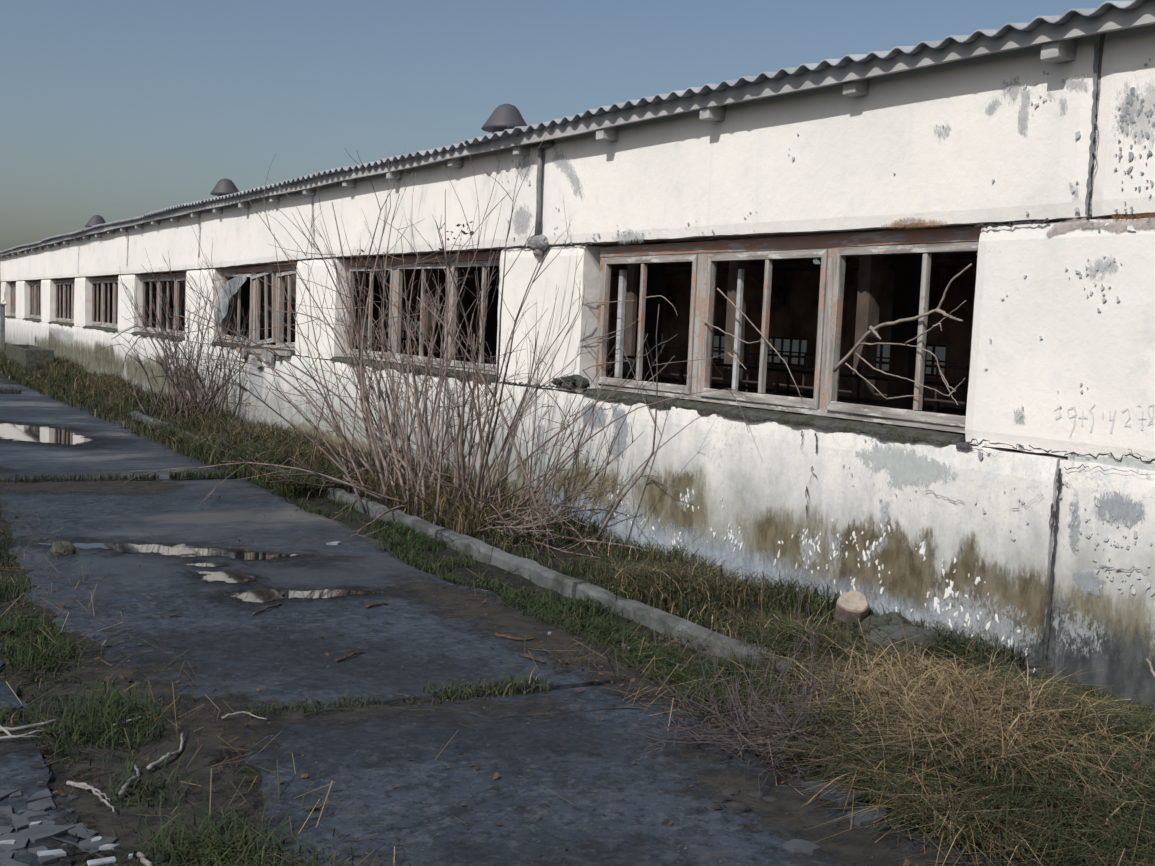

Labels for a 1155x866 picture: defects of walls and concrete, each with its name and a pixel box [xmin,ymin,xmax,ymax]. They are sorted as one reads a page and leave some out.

peeling [554,153,582,198]
peeling [985,71,1087,136]
spalling [1046,87,1155,237]
damp [494,459,1155,709]
peeling [773,439,956,595]
crack [960,439,1155,681]
peeling [1056,476,1155,597]